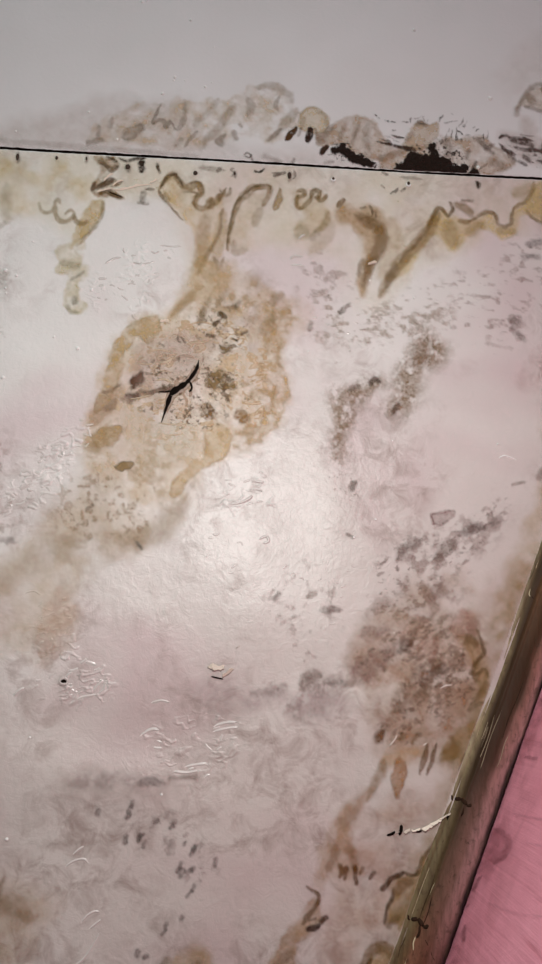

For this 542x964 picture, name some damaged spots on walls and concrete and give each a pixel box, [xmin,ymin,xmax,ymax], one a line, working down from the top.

damp [285,107,542,175]
damp [91,156,223,212]
damp [383,205,461,292]
crack [136,354,200,423]
damp [99,306,245,424]
damp [115,456,142,471]
damp [381,759,406,797]
damp [420,745,464,771]
peeling [387,795,472,836]
damp [299,887,328,934]
damp [339,865,373,885]
damp [381,848,430,925]